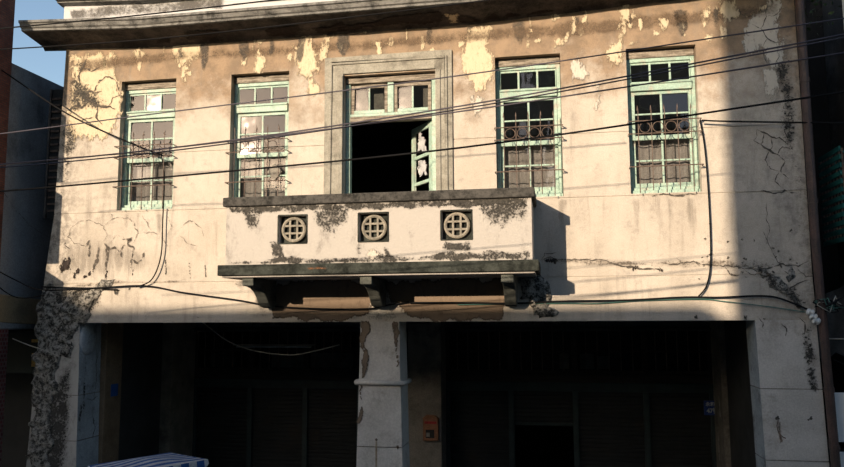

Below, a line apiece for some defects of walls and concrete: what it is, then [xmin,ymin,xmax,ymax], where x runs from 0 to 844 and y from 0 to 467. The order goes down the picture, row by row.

peeling [66,51,125,142]
peeling [241,10,560,117]
peeling [604,4,643,67]
peeling [701,0,787,107]
water stain [777,60,795,152]
crack [65,214,204,270]
water stain [229,198,528,232]
water stain [261,241,530,264]
crack [542,120,812,289]
flaking render [272,278,505,424]
water stain [802,326,818,392]
water stain [47,370,85,467]